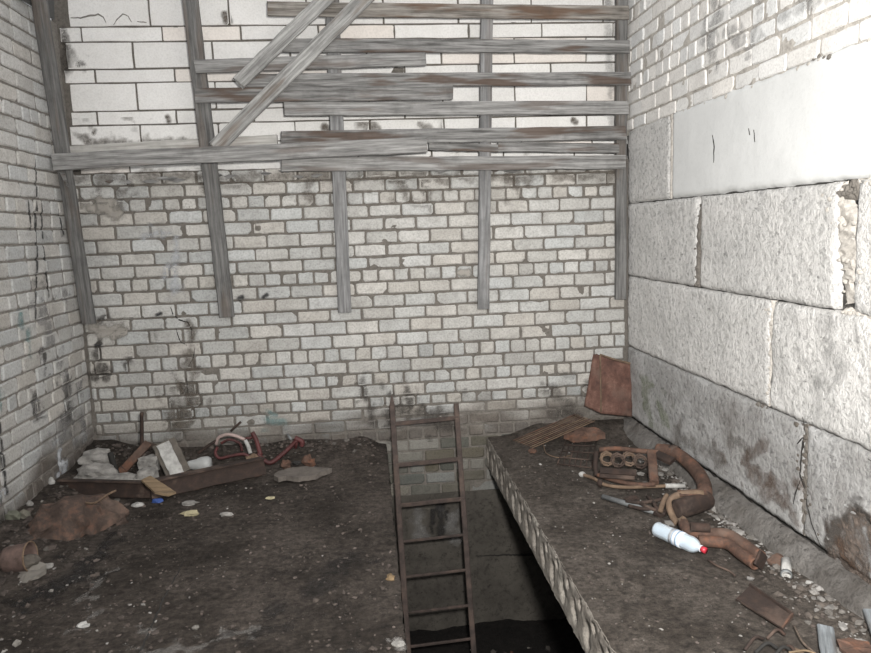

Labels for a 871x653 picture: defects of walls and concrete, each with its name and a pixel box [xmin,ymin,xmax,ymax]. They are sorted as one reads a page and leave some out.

damp [168,321,212,432]
spalling [794,422,811,515]
crack [793,417,823,548]
spalling [817,504,871,585]